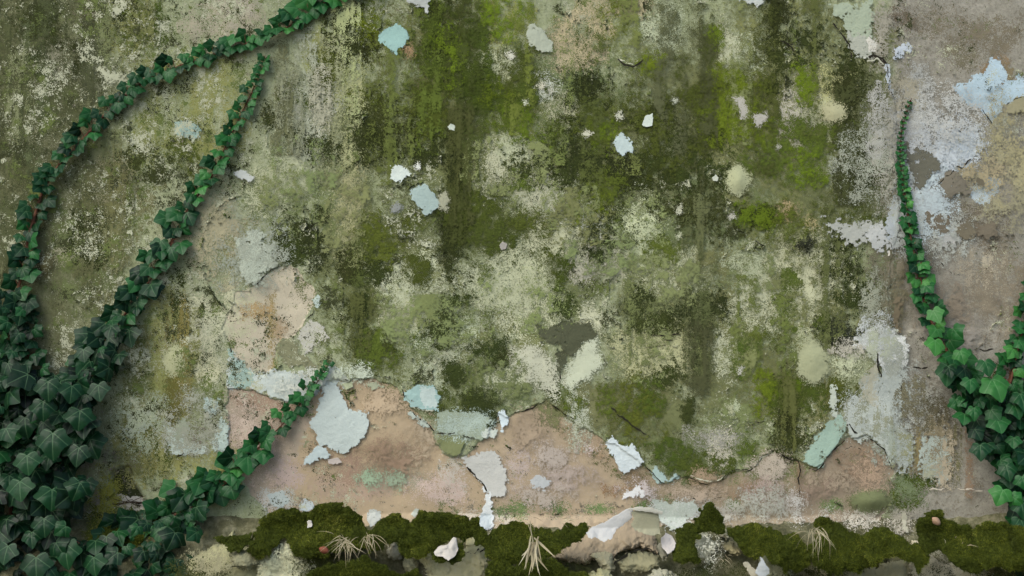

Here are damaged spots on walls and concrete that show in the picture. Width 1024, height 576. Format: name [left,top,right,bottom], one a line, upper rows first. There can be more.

flaking render [378,23,409,55]
peeling [1007,96,1024,113]
flaking render [612,132,633,156]
flaking render [390,165,440,215]
damp [93,0,964,539]
peeling [224,266,317,374]
crack [611,408,650,437]
peeling [225,379,894,530]
crack [644,424,892,501]